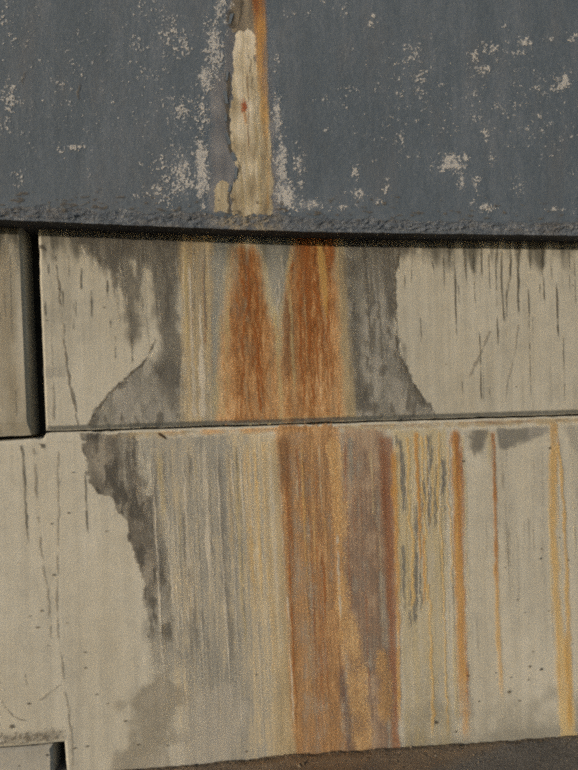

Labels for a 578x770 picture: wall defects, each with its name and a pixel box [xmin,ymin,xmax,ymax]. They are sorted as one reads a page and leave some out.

rust [254,0,265,80]
spalling [0,0,578,236]
crack [63,325,78,425]
rust [203,238,401,755]
water stain [67,229,578,770]
rust [452,431,468,700]
rust [550,424,574,736]